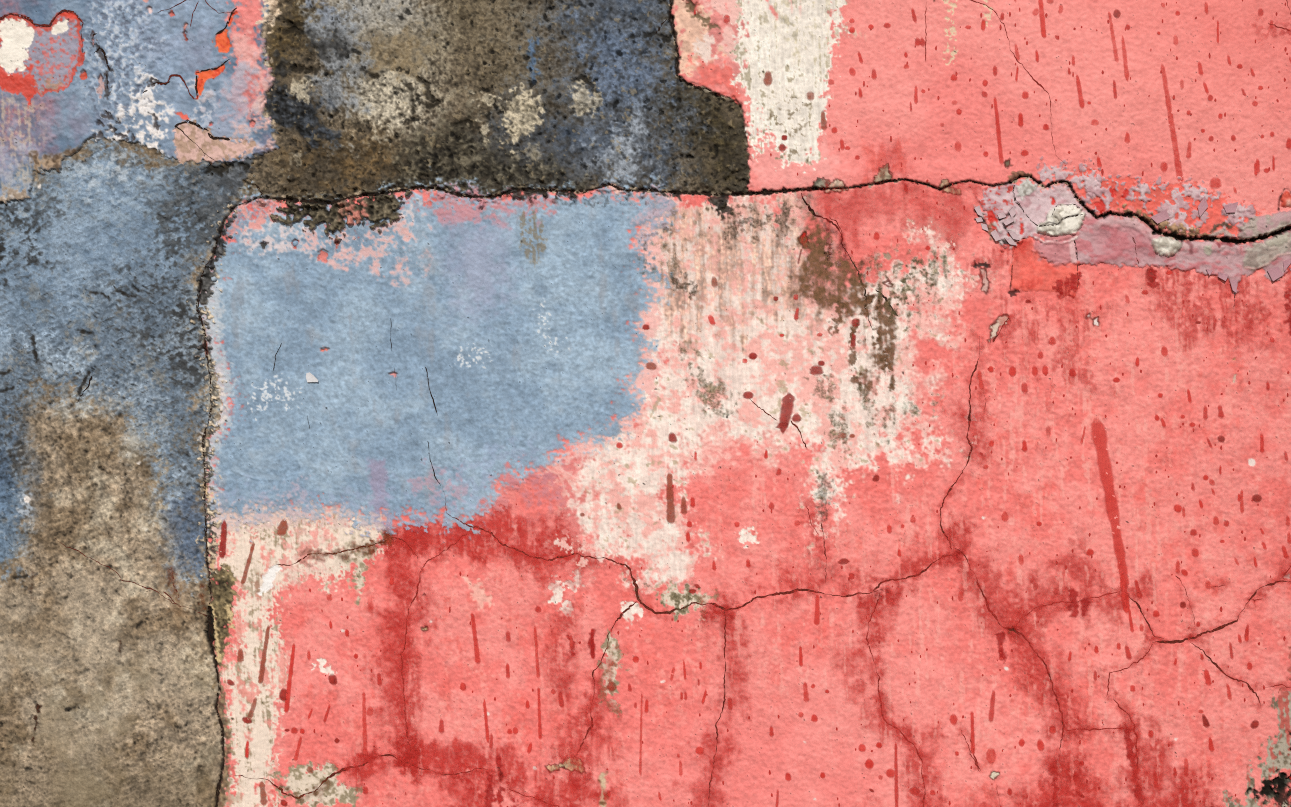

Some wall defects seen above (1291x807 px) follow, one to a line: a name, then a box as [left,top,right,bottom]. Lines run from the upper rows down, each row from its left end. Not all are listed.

peeling [0,11,106,105]
crack [971,0,1055,149]
flaking render [173,0,1291,718]
crack [55,175,1291,807]
peeling [1223,647,1291,807]